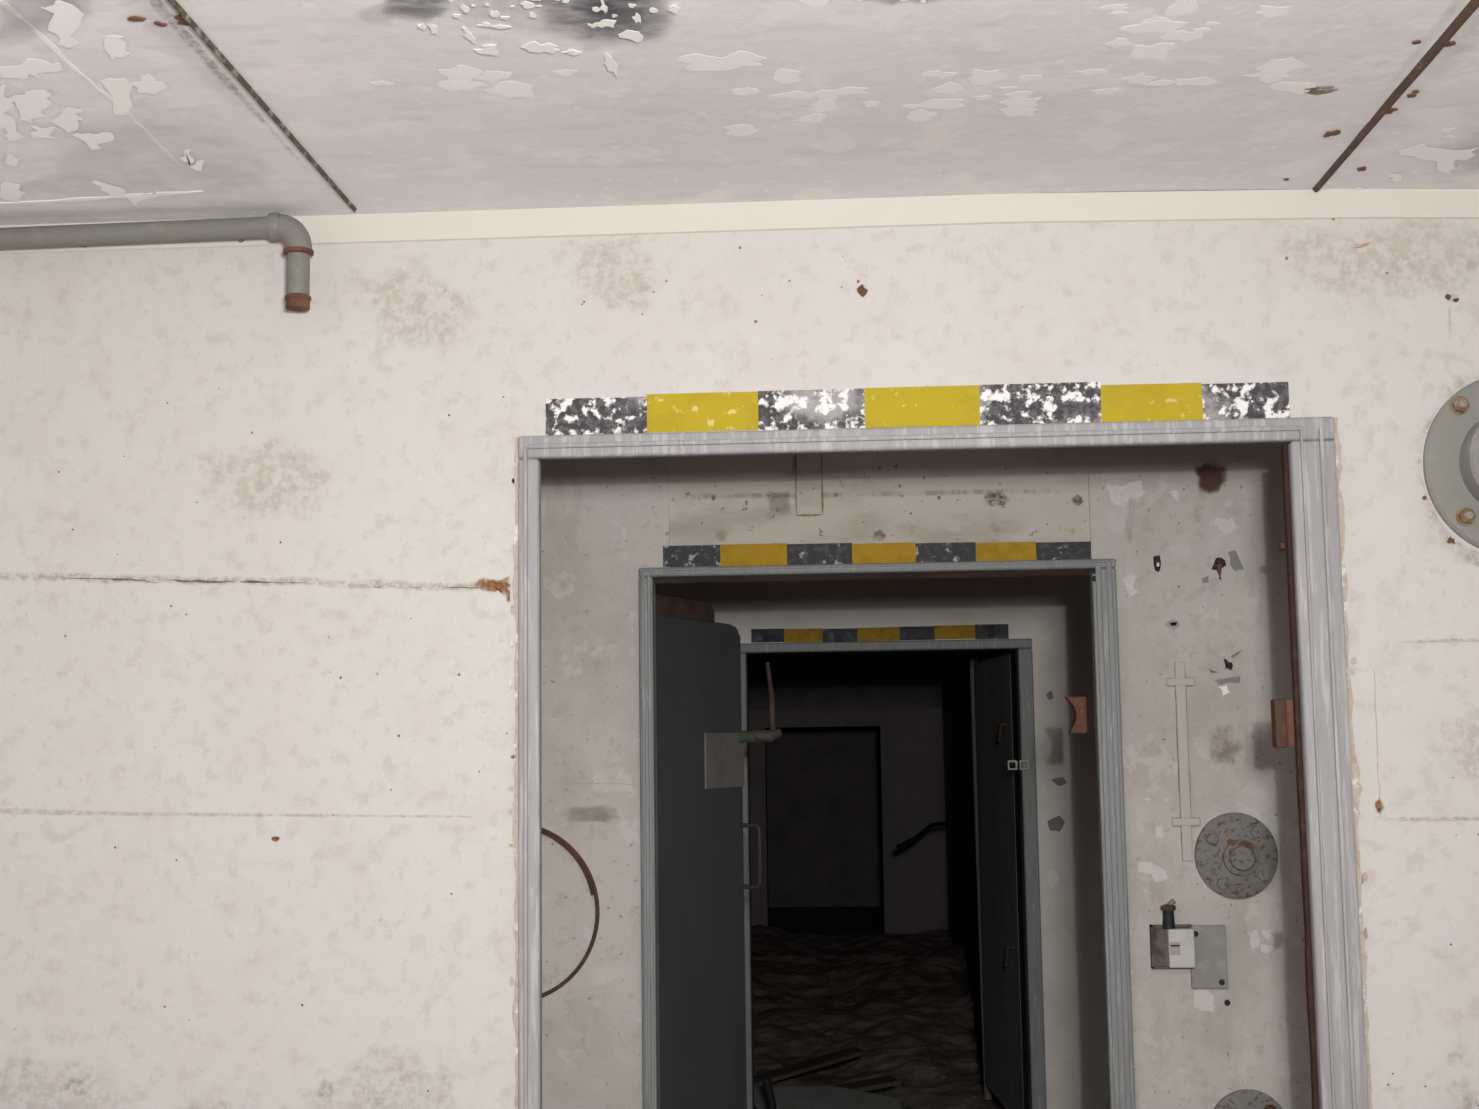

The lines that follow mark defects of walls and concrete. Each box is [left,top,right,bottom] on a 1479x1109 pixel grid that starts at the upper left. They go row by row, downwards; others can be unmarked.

leakage [589,0,639,17]
peeling [100,15,189,115]
peeling [0,0,114,202]
peeling [179,150,204,172]
peeling [91,180,158,208]
peeling [1106,481,1146,508]
flaking render [1202,517,1244,583]
flaking render [1153,555,1161,572]
crack [61,576,303,584]
crack [375,583,483,591]
rust [477,577,510,601]